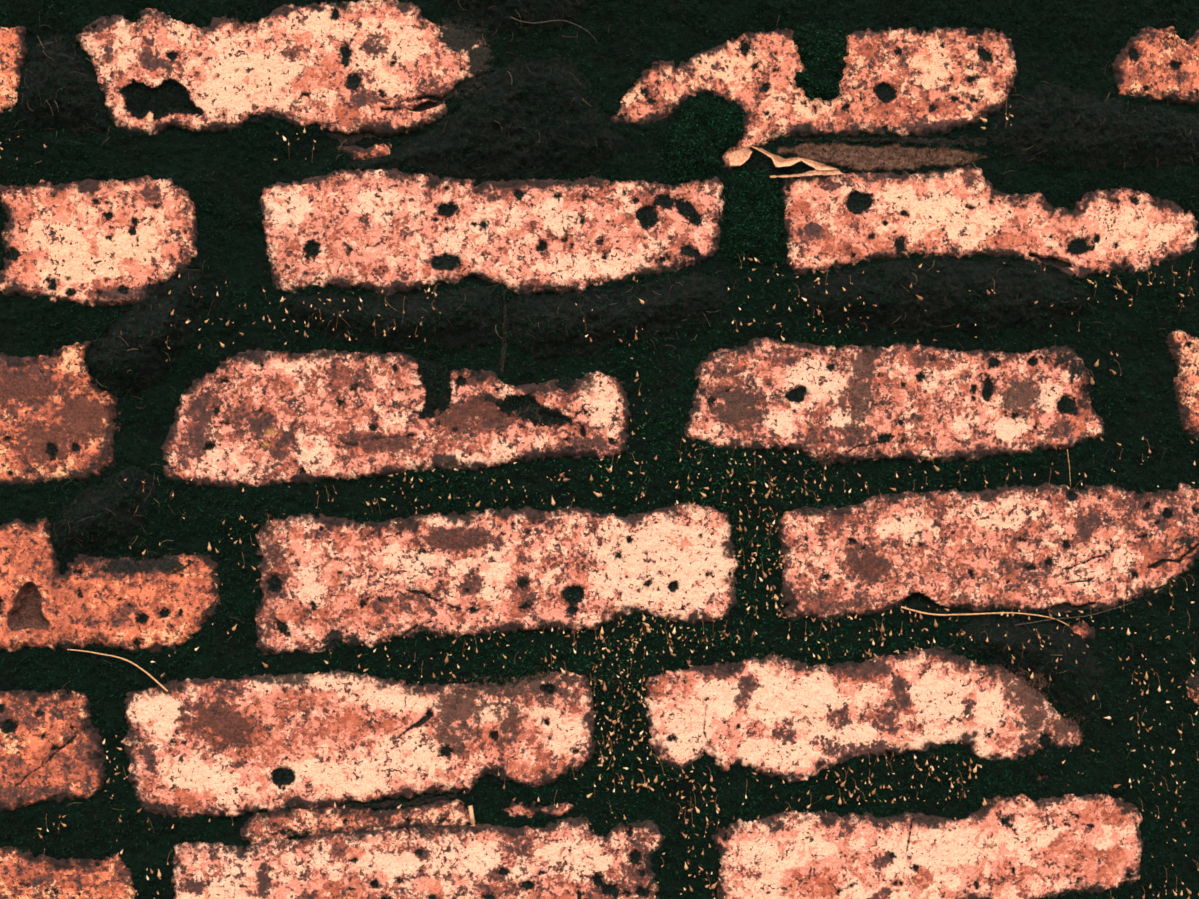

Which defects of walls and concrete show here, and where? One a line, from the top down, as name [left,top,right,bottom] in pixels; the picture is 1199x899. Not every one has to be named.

spalling [740,40,782,92]
spalling [119,78,204,122]
hole [91,198,113,220]
hole [128,217,139,236]
hole [637,570,679,593]
hole [103,589,183,647]
crack [15,726,91,787]
hole [889,852,921,886]